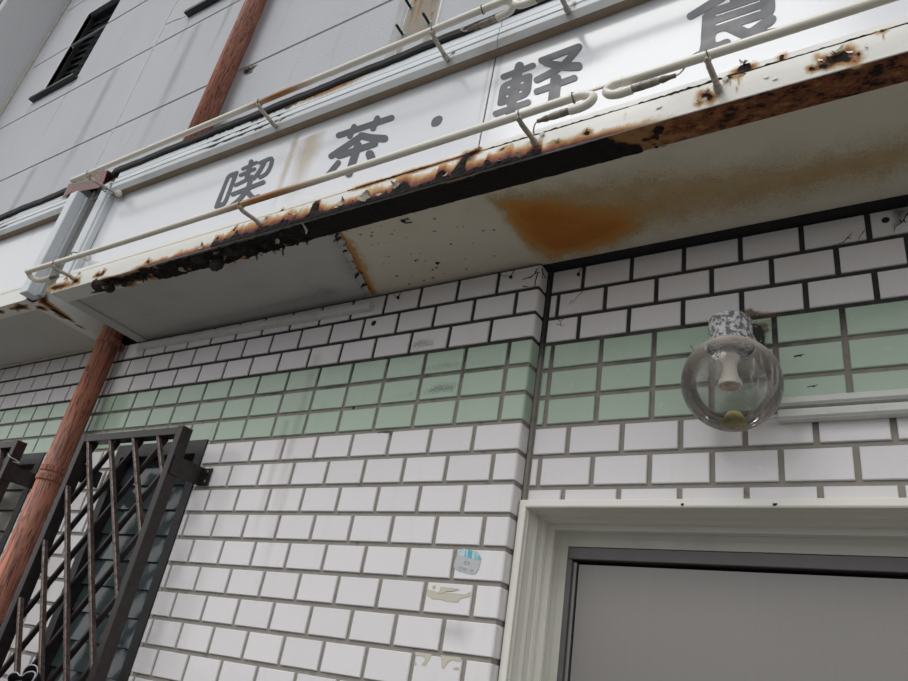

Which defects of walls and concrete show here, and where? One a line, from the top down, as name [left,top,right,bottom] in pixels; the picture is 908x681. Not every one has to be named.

rust [91,44,908,295]
rust [0,276,85,329]